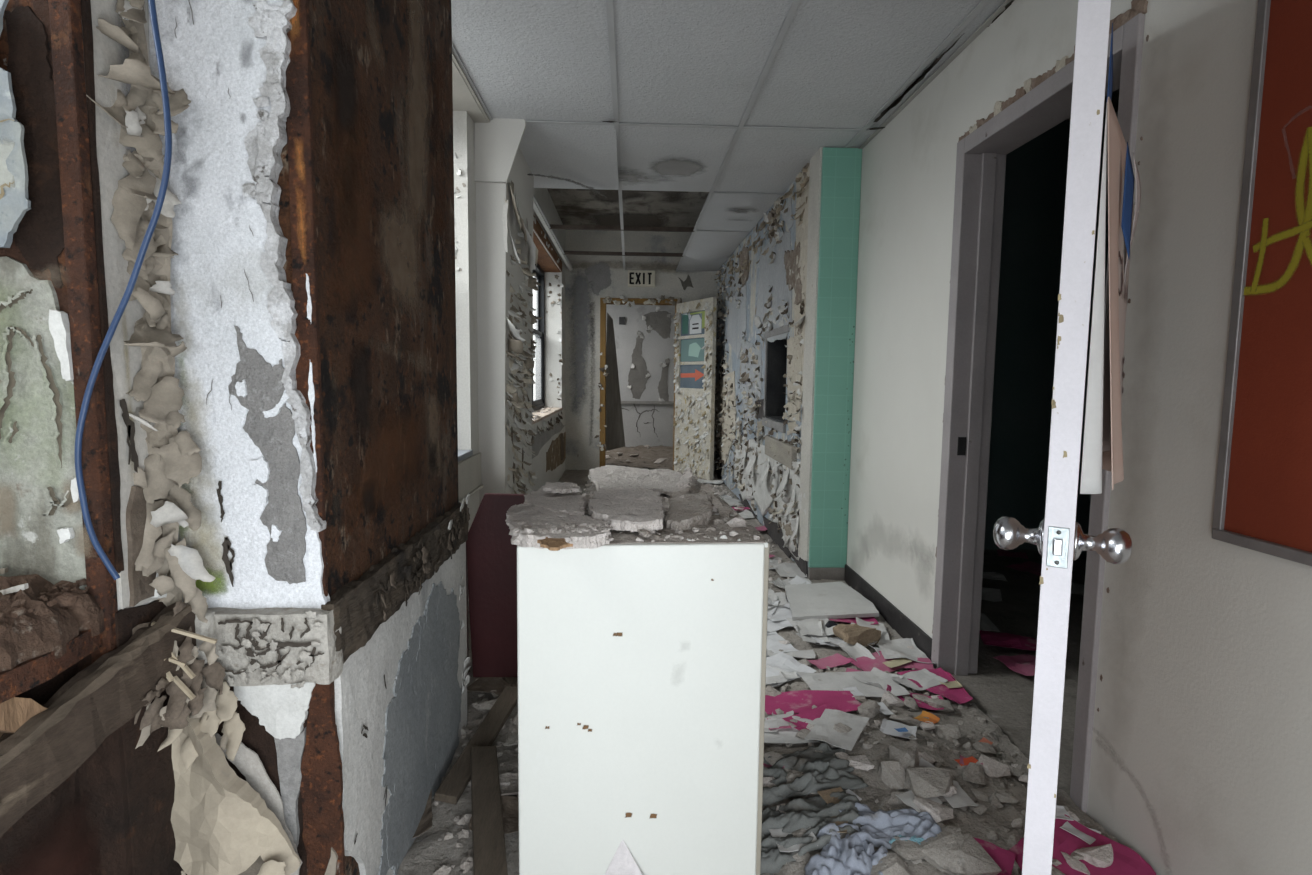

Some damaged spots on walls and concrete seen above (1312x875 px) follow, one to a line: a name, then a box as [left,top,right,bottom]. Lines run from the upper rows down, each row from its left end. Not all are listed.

crack [0,289,72,516]
rust [79,0,124,573]
peeling [86,0,327,875]
crack [216,481,235,587]
crack [218,618,324,675]
rust [296,145,304,178]
rust [383,0,427,304]
peeling [376,493,472,875]
peeling [499,773,519,834]
spalling [502,180,566,494]
damp [618,159,702,182]
peeling [585,147,823,578]